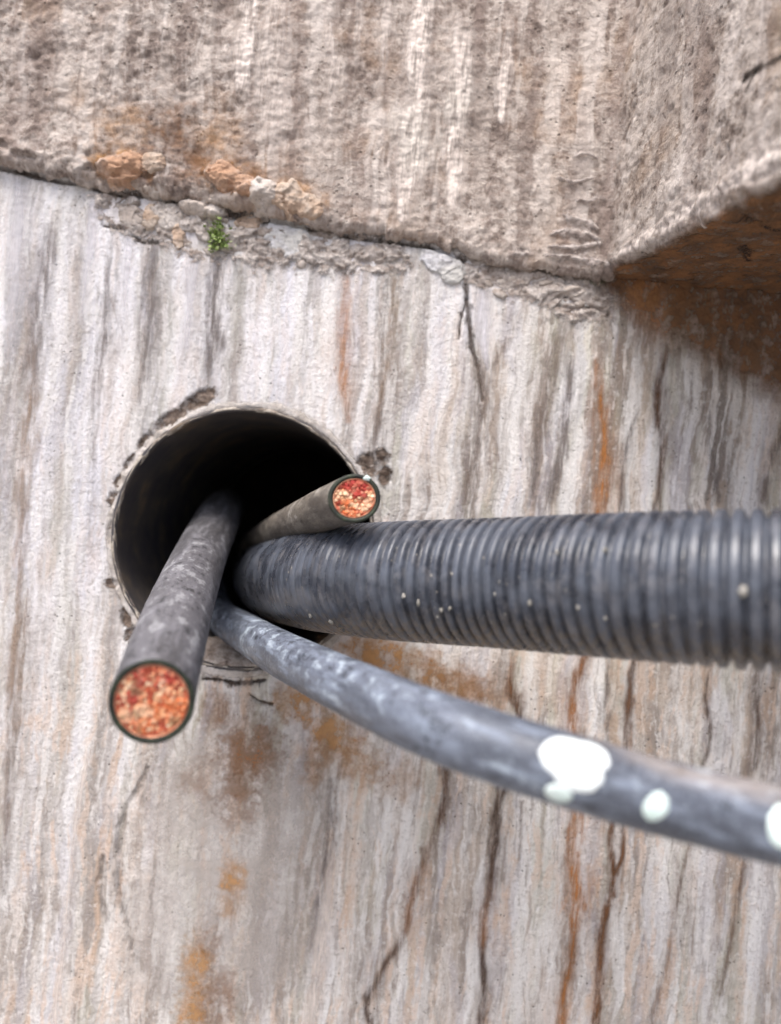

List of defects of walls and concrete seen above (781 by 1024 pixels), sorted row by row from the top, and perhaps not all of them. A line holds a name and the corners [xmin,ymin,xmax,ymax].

crack [13,170,144,198]
crack [227,210,270,227]
spalling [81,189,622,328]
crack [340,236,435,250]
crack [458,261,484,400]
spalling [106,387,218,507]
spalling [356,447,393,486]
corrosion [596,393,608,513]
corrosion [228,725,272,776]
corrosion [275,686,356,753]